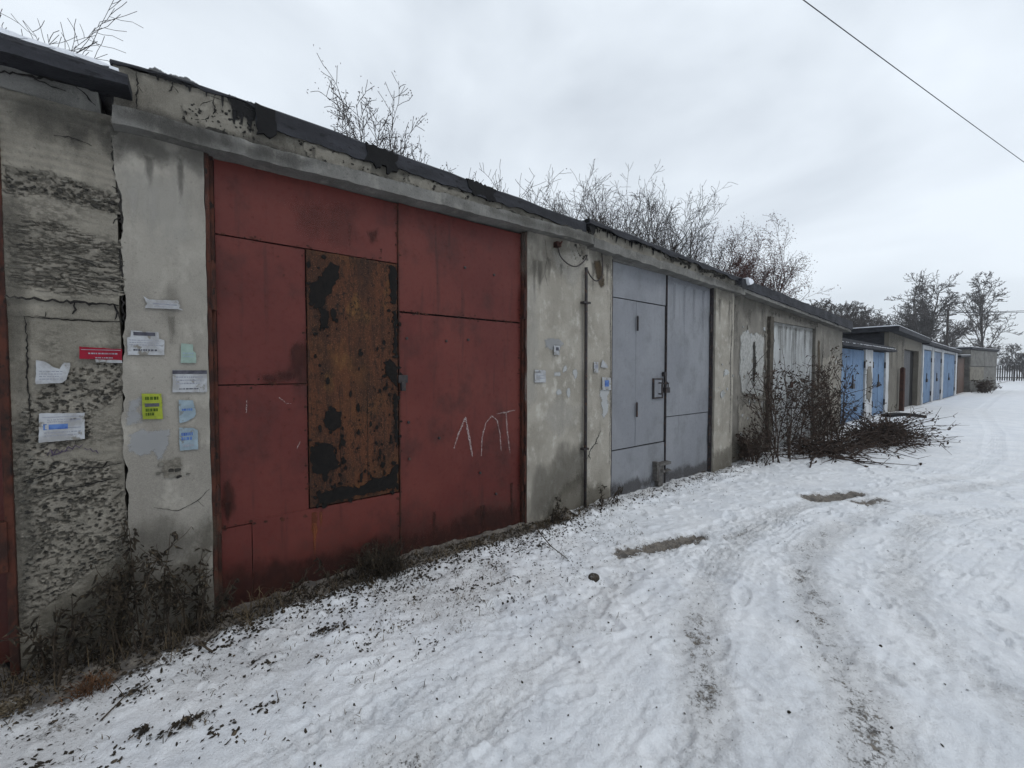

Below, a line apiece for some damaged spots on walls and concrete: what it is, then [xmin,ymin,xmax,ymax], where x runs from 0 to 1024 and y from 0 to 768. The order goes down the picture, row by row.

spalling [182,102,255,143]
spalling [1,164,123,216]
spalling [3,214,126,299]
crack [6,135,126,425]
peeling [721,325,768,454]